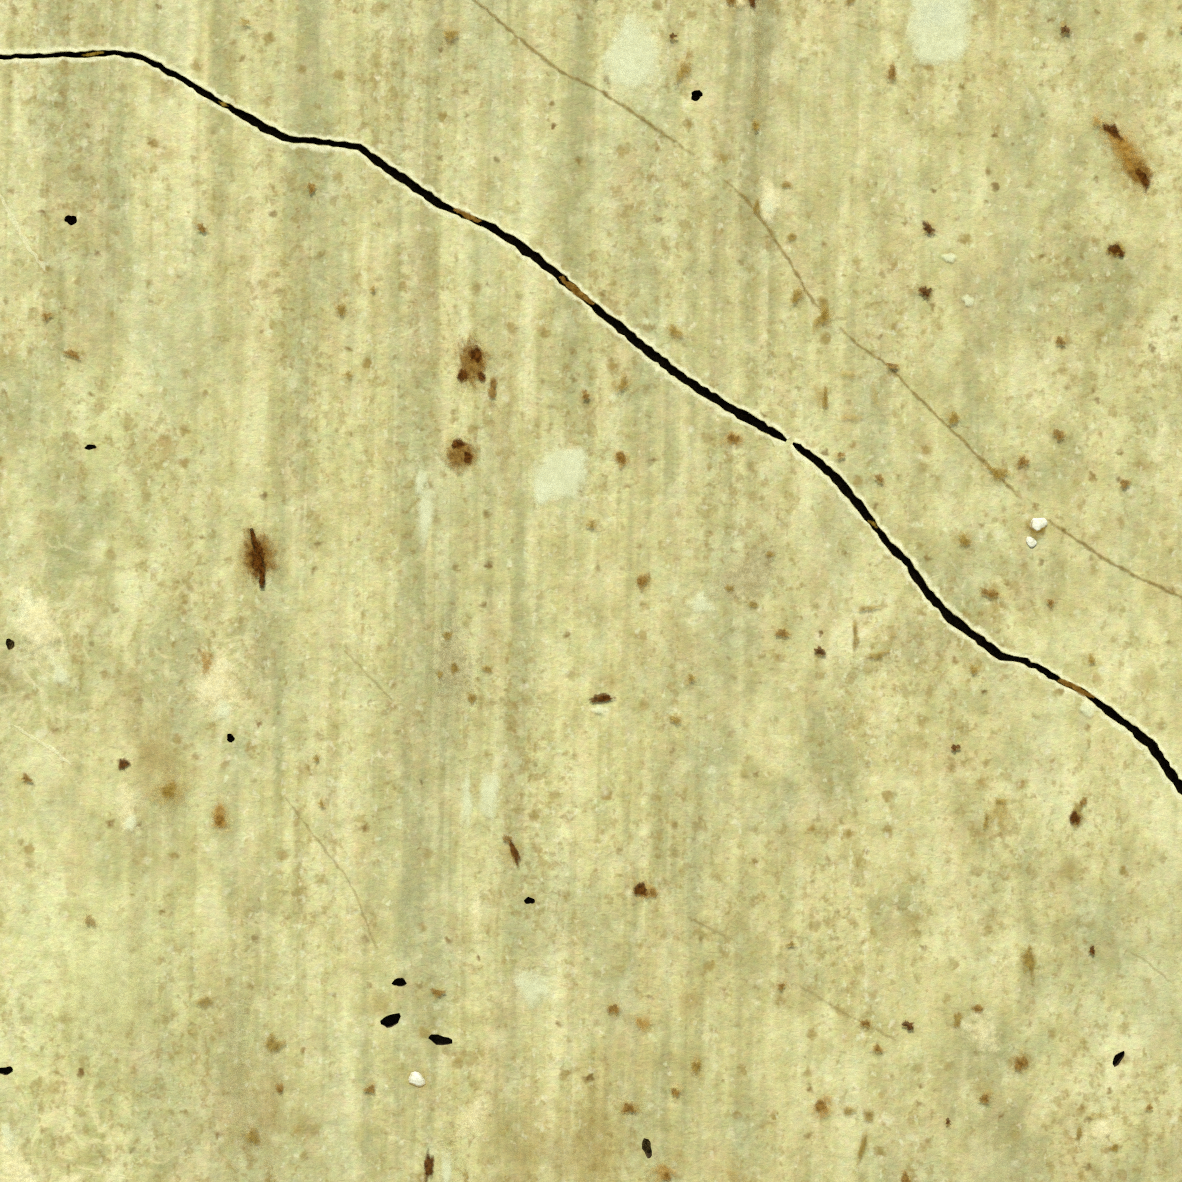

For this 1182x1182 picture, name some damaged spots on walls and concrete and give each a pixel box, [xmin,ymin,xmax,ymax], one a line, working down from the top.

crack [475,0,673,140]
corrosion [1095,120,1153,189]
corrosion [457,338,496,398]
corrosion [444,438,480,473]
crack [0,46,1182,798]
corrosion [243,528,276,588]